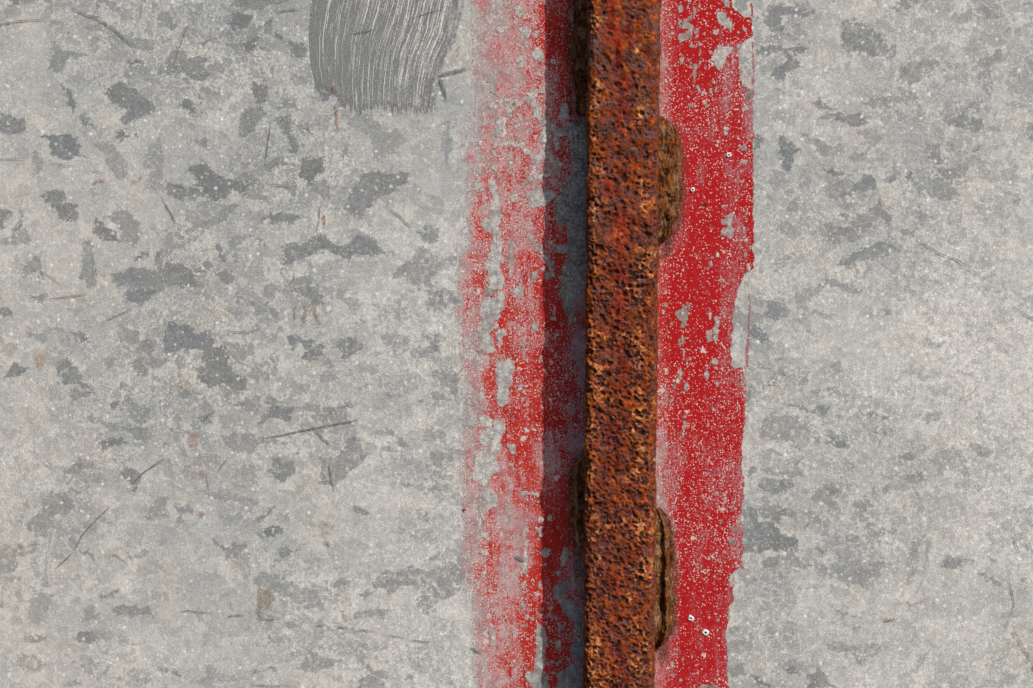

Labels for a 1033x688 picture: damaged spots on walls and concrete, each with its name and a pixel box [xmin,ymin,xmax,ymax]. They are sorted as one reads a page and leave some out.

peeling [496,4,545,68]
peeling [678,0,747,108]
peeling [738,65,754,111]
peeling [721,205,752,271]
peeling [468,88,588,556]
peeling [662,302,691,404]
peeling [706,312,721,343]
peeling [517,514,585,688]